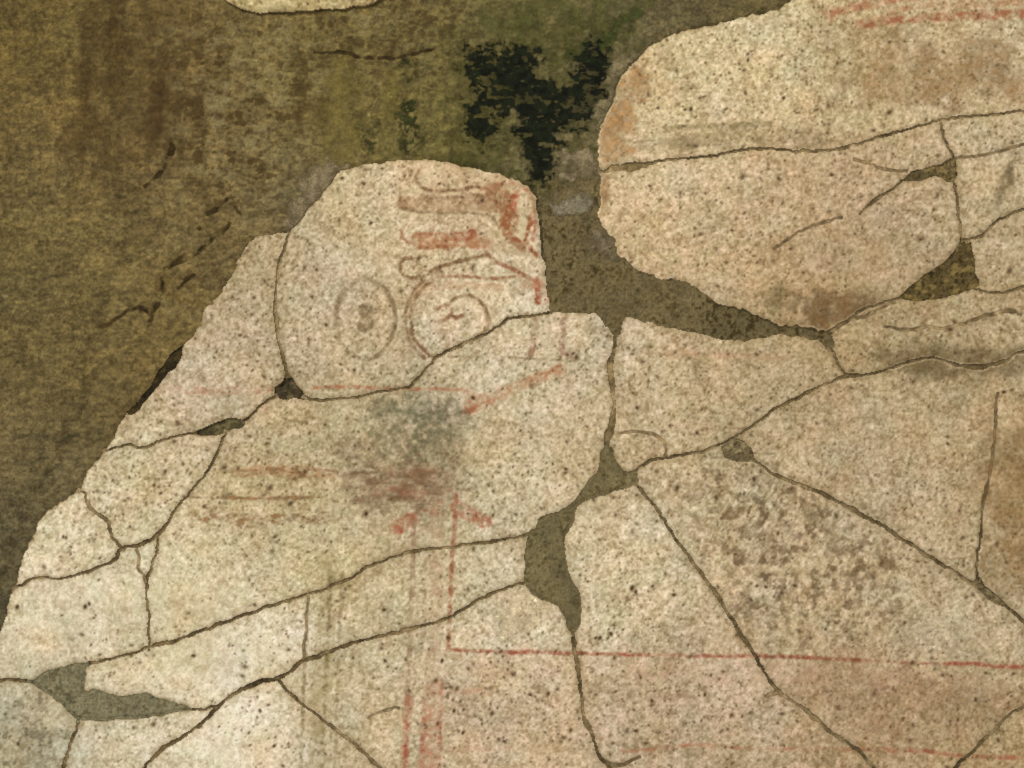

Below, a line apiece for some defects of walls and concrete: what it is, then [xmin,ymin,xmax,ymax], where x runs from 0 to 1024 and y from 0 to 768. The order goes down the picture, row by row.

leakage [386,58,423,153]
leakage [451,8,647,189]
crack [597,109,1024,250]
spalling [0,0,834,637]
spalling [898,237,979,301]
crack [11,231,551,768]
leakage [351,465,441,509]
leakage [383,395,462,457]
crack [604,285,1024,768]
spalling [811,547,893,609]
spalling [27,661,192,724]
crack [571,637,641,768]